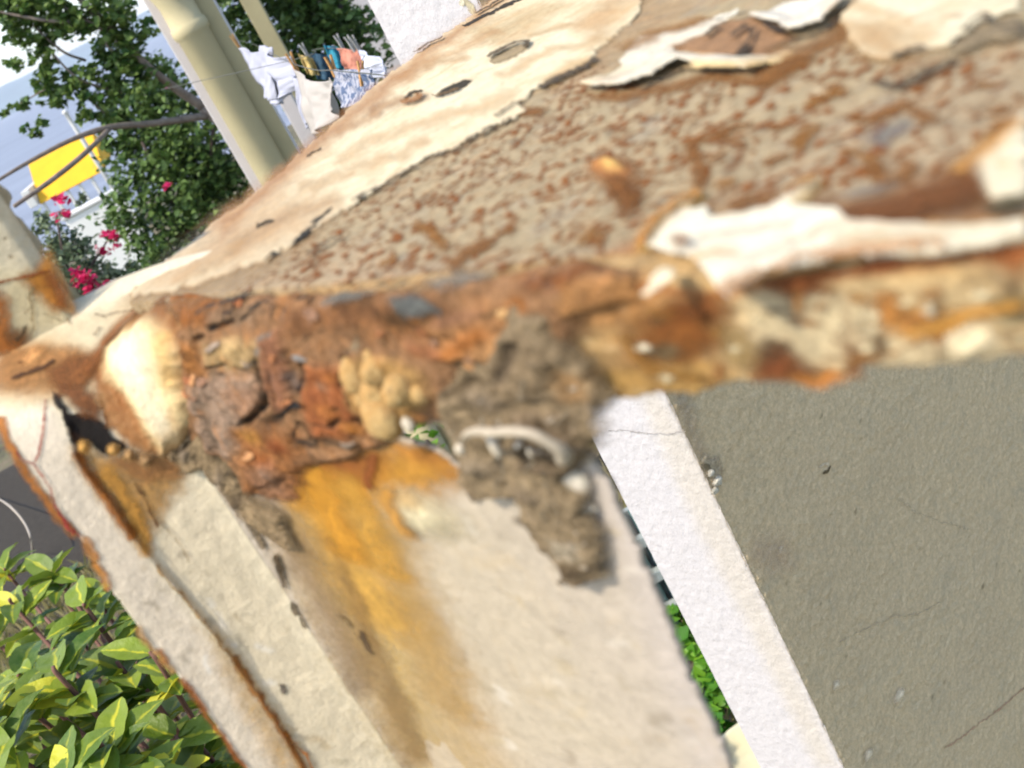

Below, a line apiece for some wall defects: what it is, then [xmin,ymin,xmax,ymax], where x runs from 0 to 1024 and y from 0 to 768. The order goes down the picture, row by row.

peeling [130,0,1024,300]
corrosion [243,15,1024,298]
corrosion [290,442,459,755]
peeling [454,442,466,455]
peeling [484,437,534,458]
peeling [561,469,593,513]